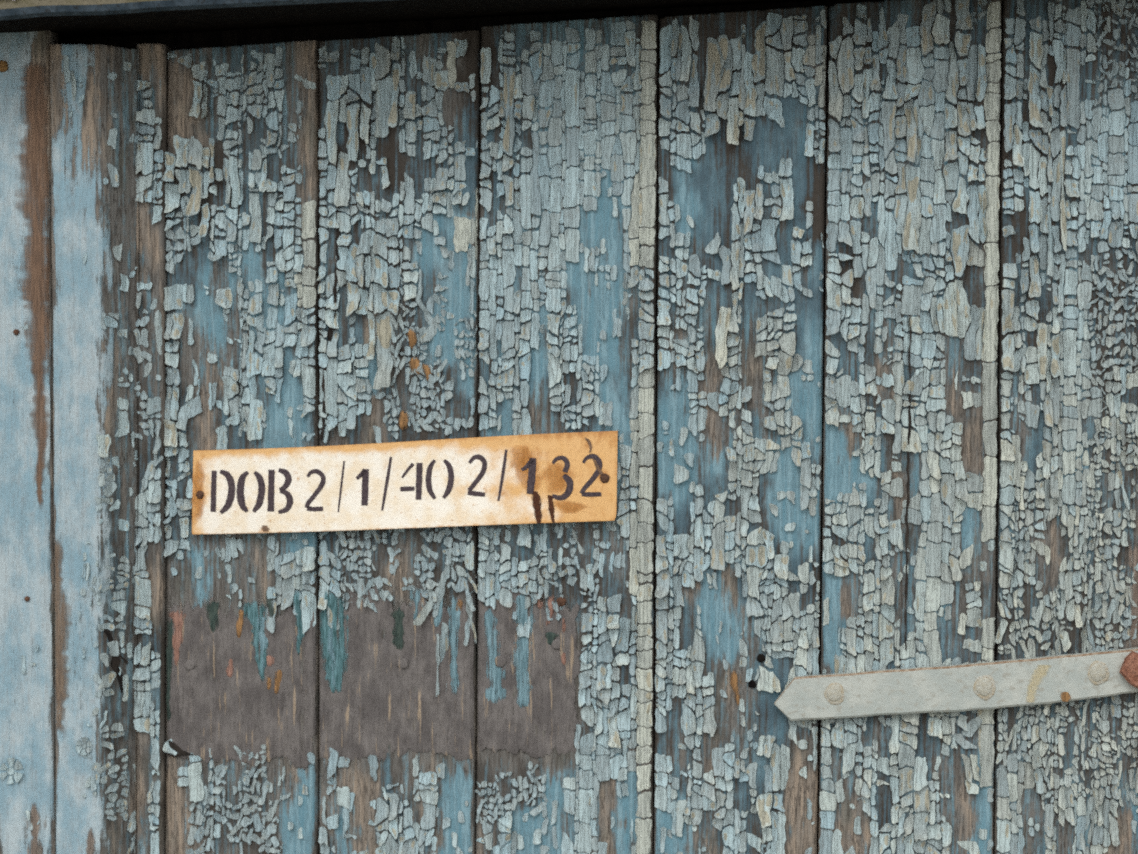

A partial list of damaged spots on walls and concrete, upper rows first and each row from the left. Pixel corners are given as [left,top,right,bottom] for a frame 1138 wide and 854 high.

peeling [107,62,132,80]
peeling [107,113,117,149]
peeling [103,163,119,187]
peeling [112,244,123,261]
corrosion [408,329,431,380]
peeling [659,0,1138,673]
corrosion [399,411,408,430]
peeling [129,20,829,854]
corrosion [516,454,583,523]
peeling [75,266,308,854]
peeling [788,693,1138,854]